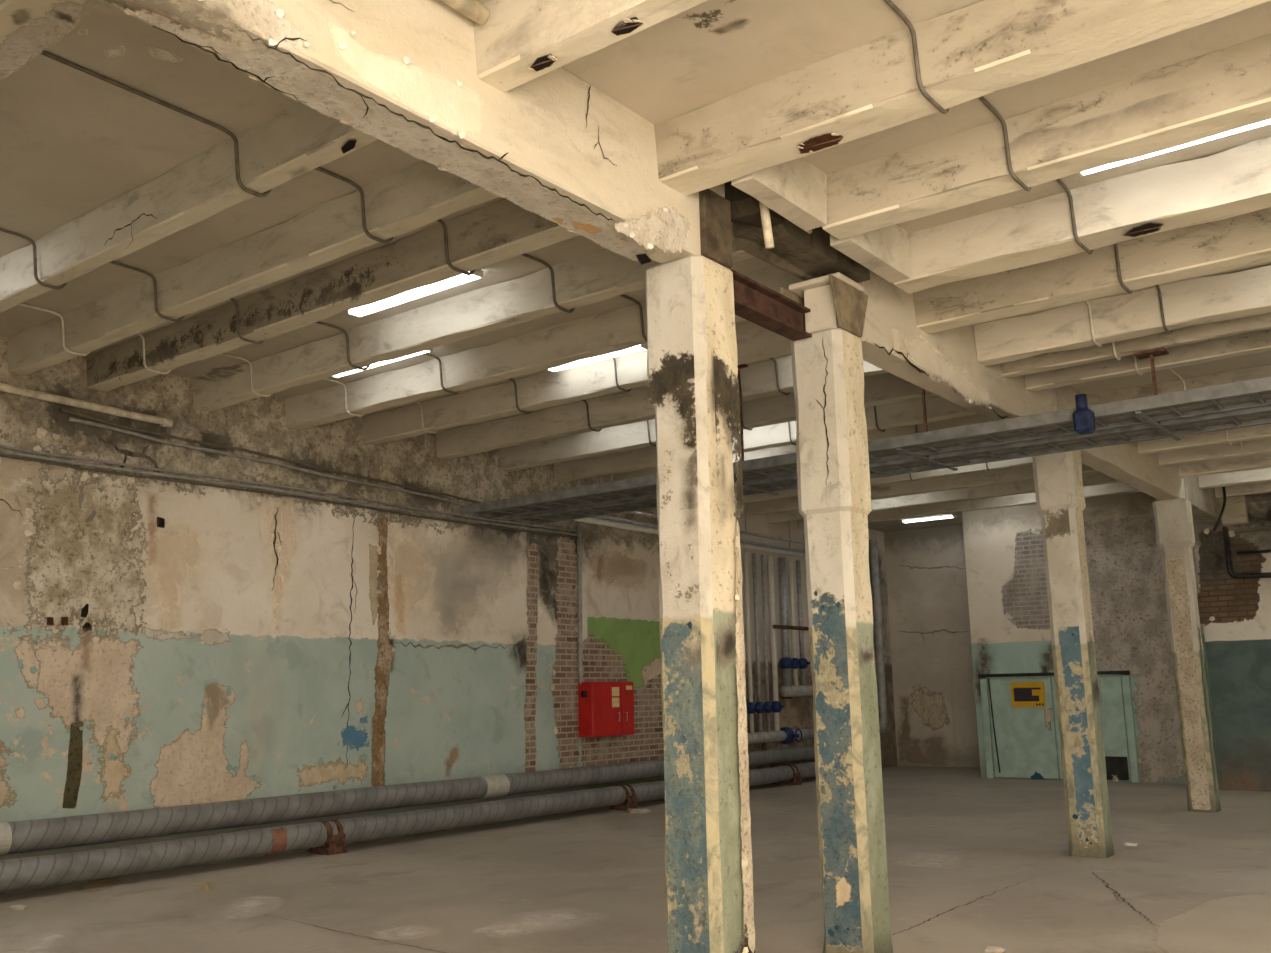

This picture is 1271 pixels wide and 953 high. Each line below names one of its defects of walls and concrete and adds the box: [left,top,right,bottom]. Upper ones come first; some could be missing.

spalling [0,2,89,78]
damp [174,0,239,30]
crack [152,26,618,223]
spalling [105,0,690,261]
damp [7,255,392,465]
damp [648,350,698,525]
damp [713,351,744,518]
flaking render [0,740,17,808]
flaking render [3,427,459,809]
spalling [735,521,755,953]
peeling [810,591,863,953]
spalling [1001,509,1266,848]